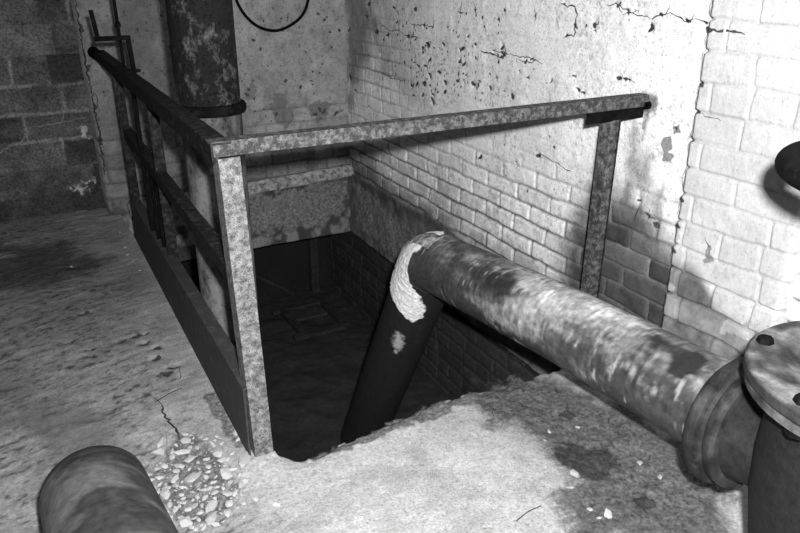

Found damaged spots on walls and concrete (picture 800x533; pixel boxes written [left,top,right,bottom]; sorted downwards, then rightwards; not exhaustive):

crack [479,45,543,64]
crack [561,1,745,328]
peeling [661,126,681,161]
crack [151,396,183,449]